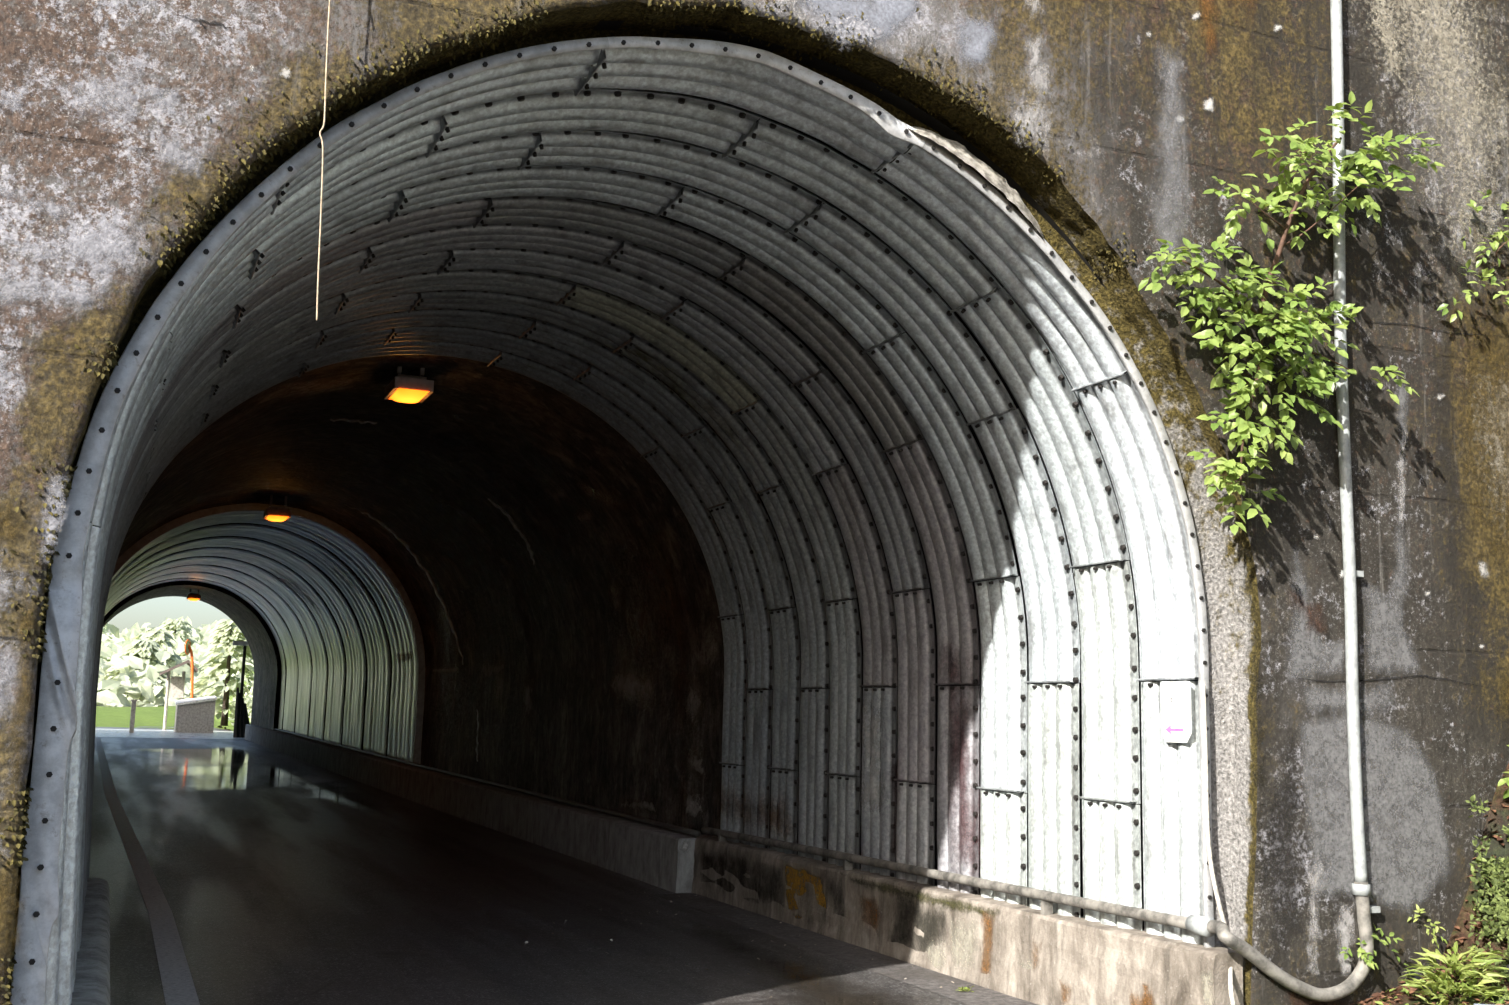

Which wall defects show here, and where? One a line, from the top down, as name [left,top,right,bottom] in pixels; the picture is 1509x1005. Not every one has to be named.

leakage [1270,386,1448,972]